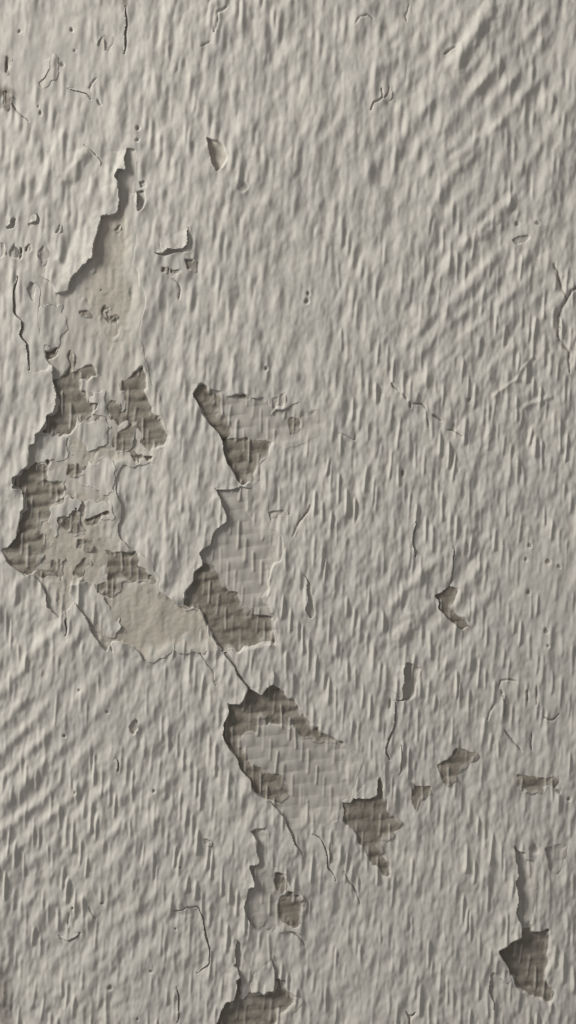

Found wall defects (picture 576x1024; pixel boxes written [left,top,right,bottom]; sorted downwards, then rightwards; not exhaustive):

peeling [0,127,403,934]
peeling [427,586,469,630]
peeling [411,782,431,812]
peeling [438,746,479,787]
peeling [517,775,570,800]
peeling [482,843,568,1016]
peeling [202,940,303,1024]